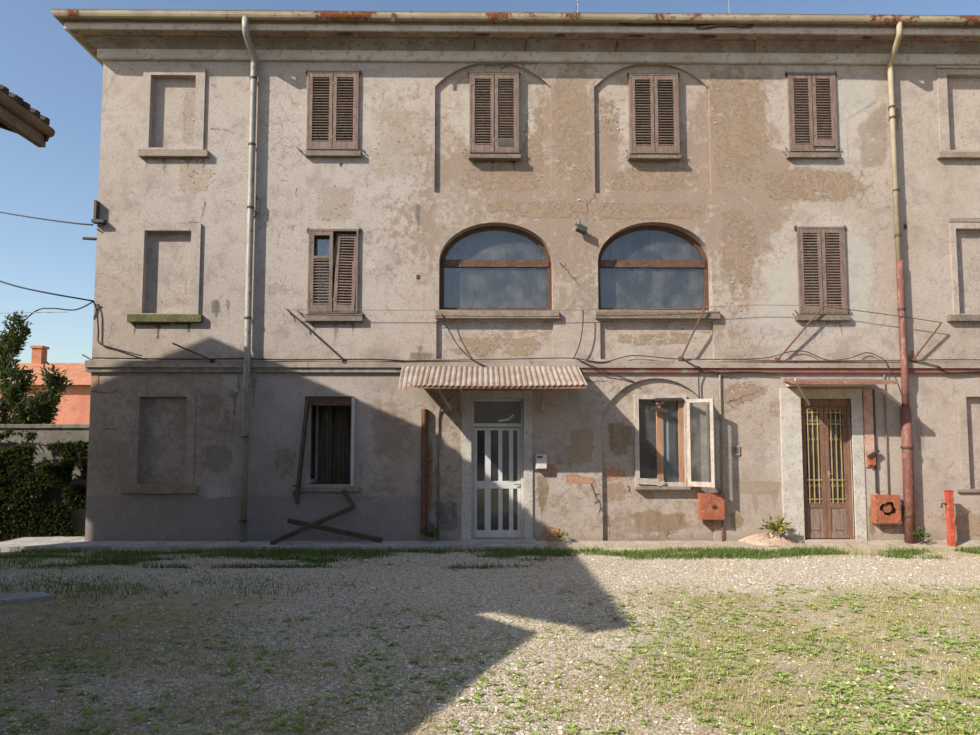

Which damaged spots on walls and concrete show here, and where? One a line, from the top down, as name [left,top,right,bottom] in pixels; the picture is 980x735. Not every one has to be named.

corrosion [485,13,512,25]
corrosion [956,16,980,25]
flaking render [461,108,545,192]
flaking render [762,167,864,202]
flaking render [450,333,541,356]
flaking render [617,332,697,345]
flaking render [546,464,627,501]